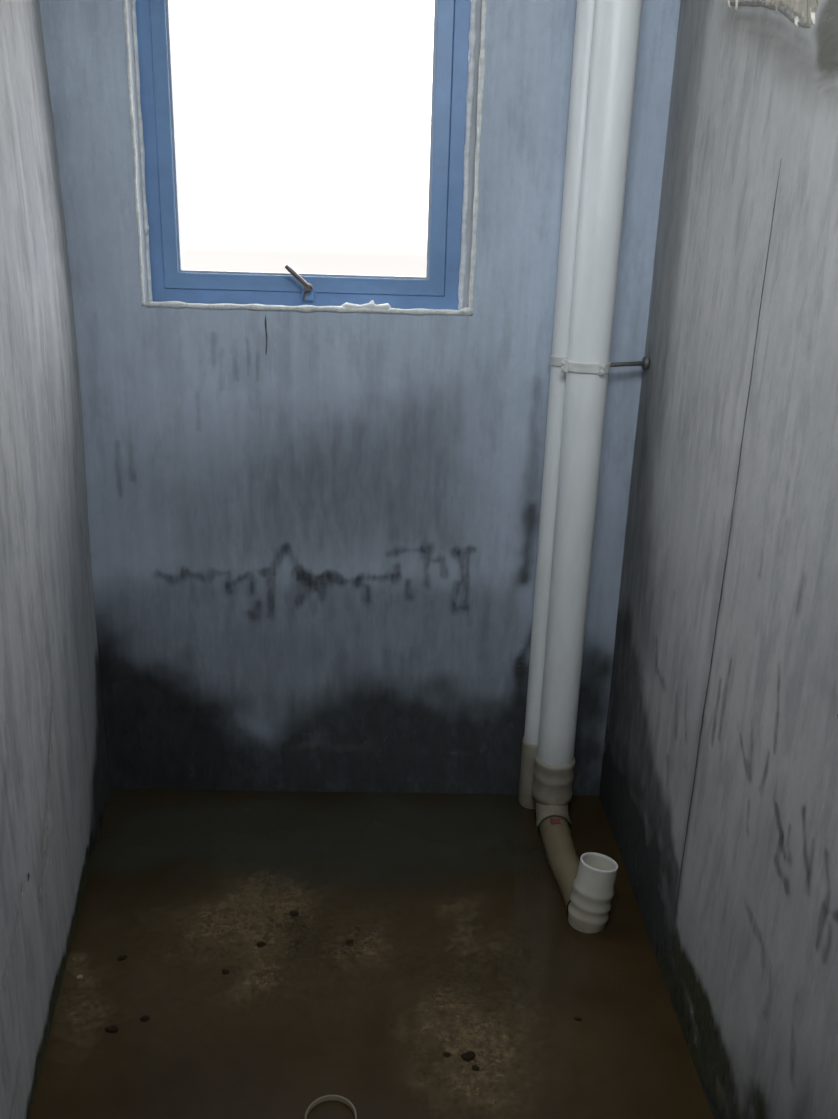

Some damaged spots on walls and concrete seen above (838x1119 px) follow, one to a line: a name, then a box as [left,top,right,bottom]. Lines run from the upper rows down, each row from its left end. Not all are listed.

flaking render [725,0,820,28]
damp [98,651,529,795]
damp [572,613,691,1034]
crack [672,163,781,933]